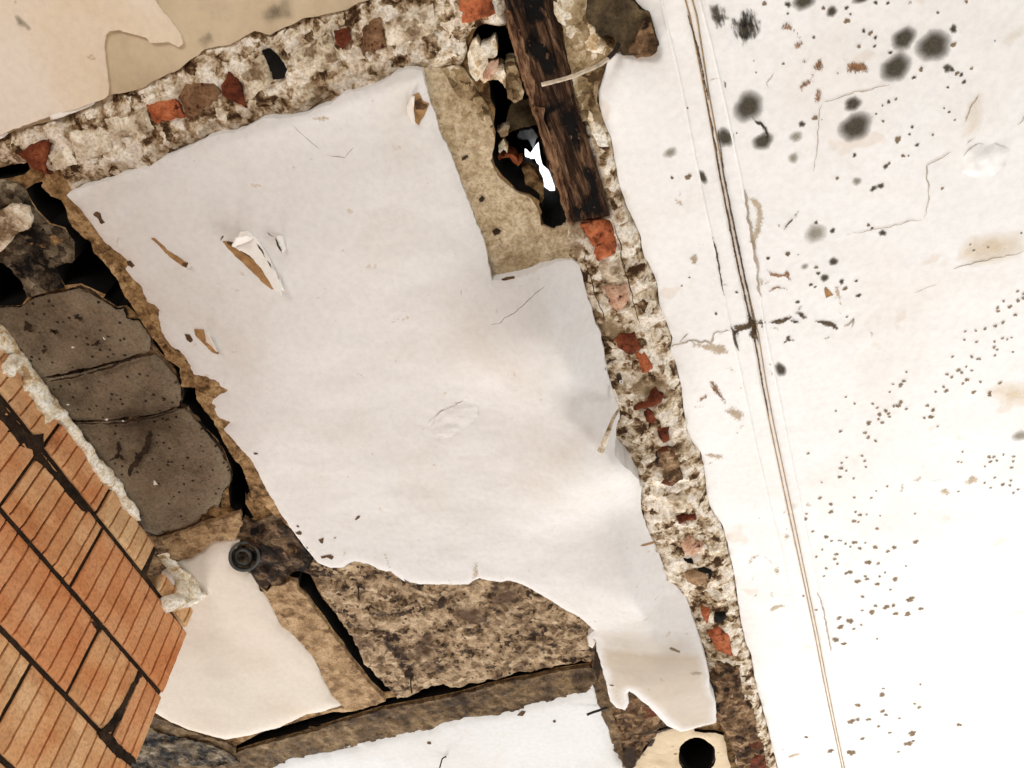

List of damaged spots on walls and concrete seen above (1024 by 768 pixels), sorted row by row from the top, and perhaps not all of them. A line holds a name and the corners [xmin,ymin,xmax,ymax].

peeling [0,0,184,139]
spalling [585,0,659,58]
leakage [711,1,767,43]
leakage [884,25,973,88]
leakage [736,94,771,148]
crack [814,85,887,167]
leakage [842,98,897,139]
flaking render [407,67,573,281]
crack [854,98,977,233]
crack [670,271,854,347]
spalling [306,537,603,698]
spalling [607,685,667,761]